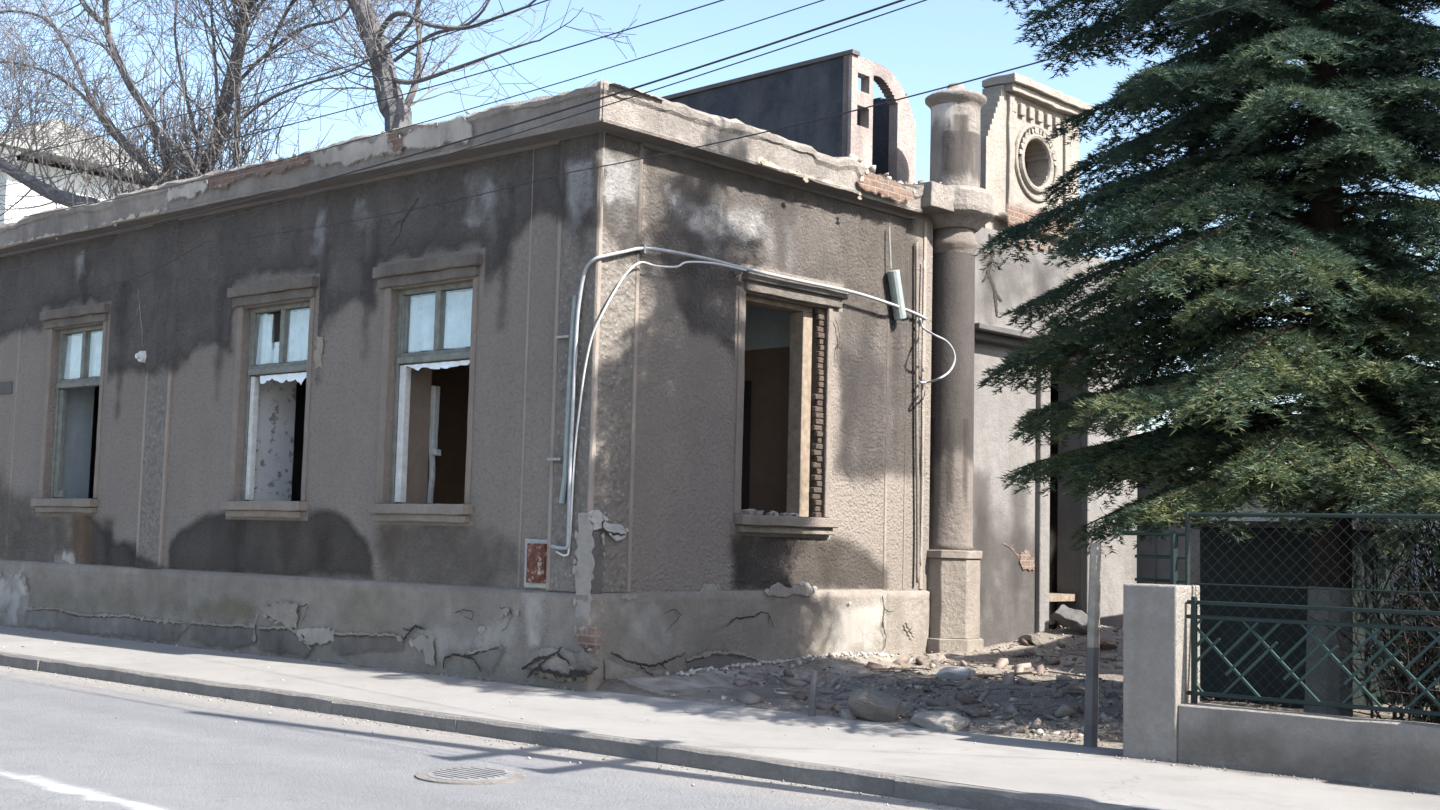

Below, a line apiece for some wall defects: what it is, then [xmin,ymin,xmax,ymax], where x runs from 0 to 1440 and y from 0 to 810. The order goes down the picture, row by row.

flaking render [387,130,411,154]
flaking render [857,169,916,203]
water stain [0,132,933,486]
water stain [0,494,500,586]
peeling [0,573,28,625]
peeling [191,601,435,666]
spalling [572,510,629,675]
crack [726,611,775,627]